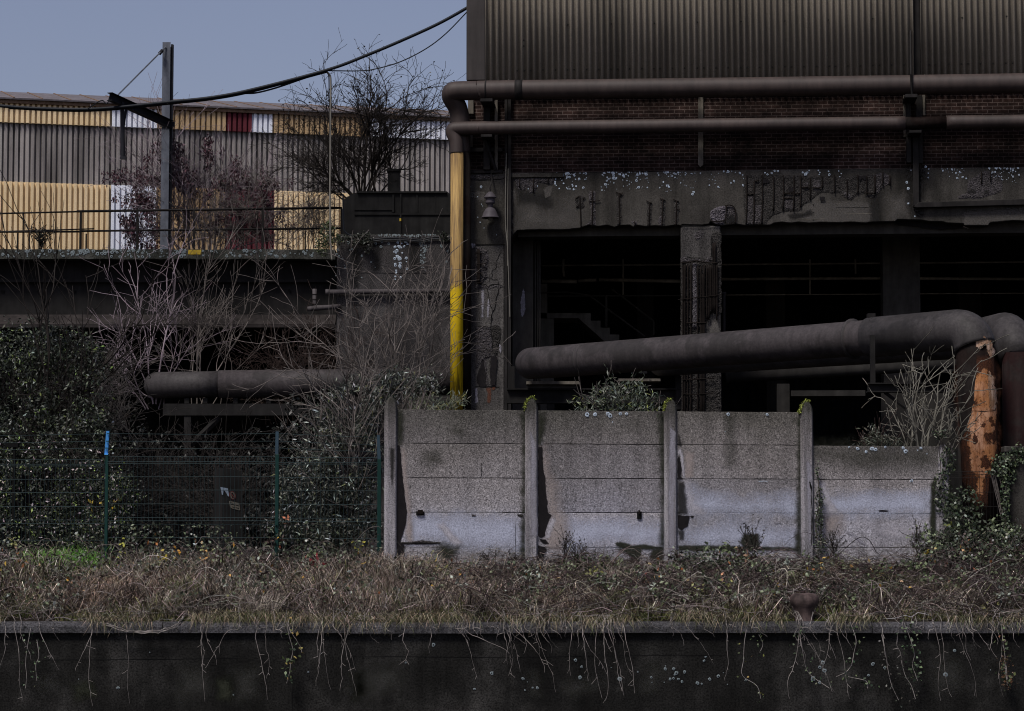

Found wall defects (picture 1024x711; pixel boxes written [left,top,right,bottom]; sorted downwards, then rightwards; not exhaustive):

spalling [678,172,891,335]
spalling [680,373,721,412]
water stain [390,411,936,565]